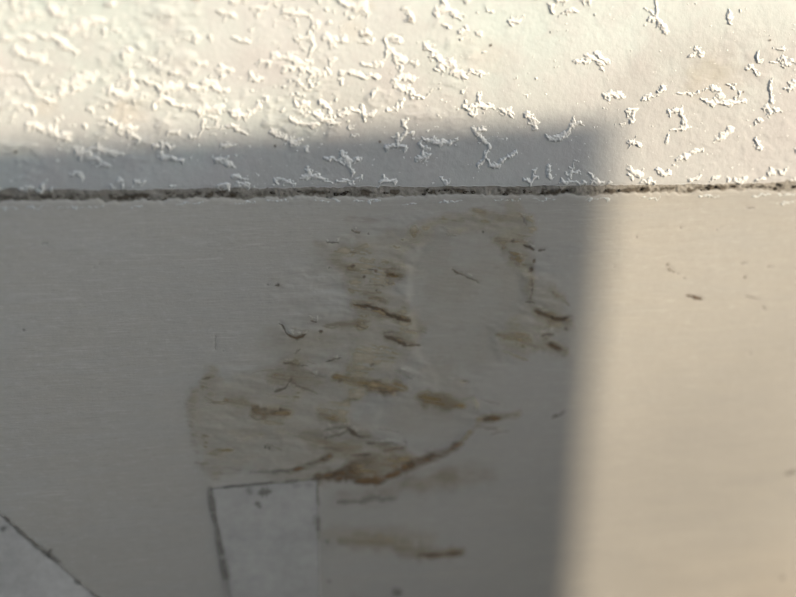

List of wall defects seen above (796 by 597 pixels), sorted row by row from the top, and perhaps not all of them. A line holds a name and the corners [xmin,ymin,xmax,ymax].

crack [273,315,319,392]
crack [356,304,420,347]
crack [527,278,569,353]
crack [324,422,400,444]